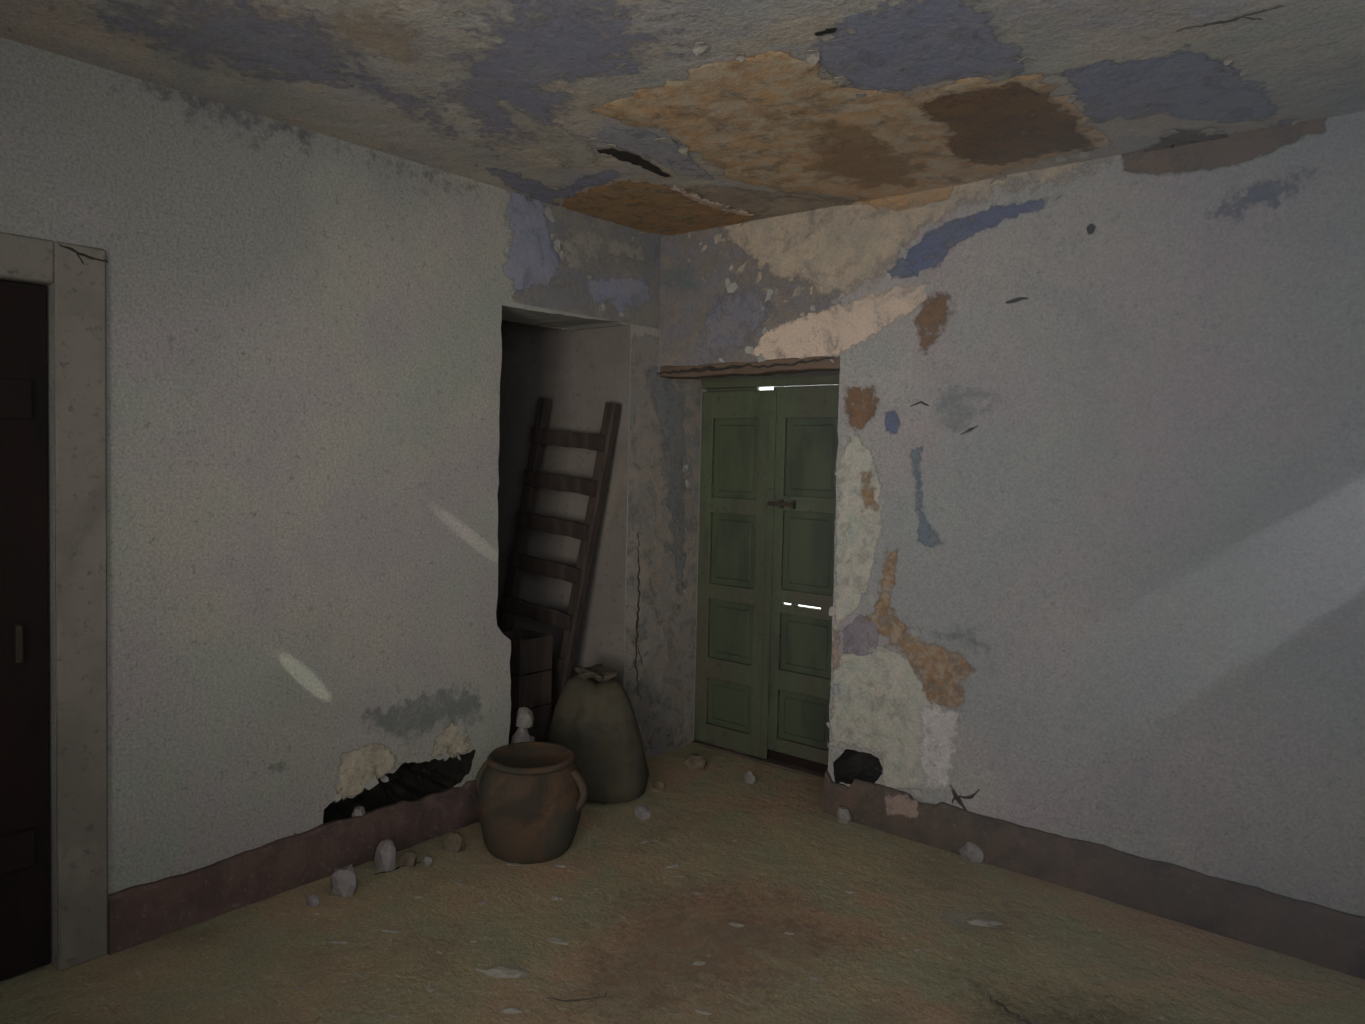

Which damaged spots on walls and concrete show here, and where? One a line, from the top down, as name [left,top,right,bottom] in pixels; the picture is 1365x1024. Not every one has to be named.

flaking render [471,51,1113,362]
peeling [885,410,900,434]
spalling [323,718,476,824]
flaking render [826,429,939,819]